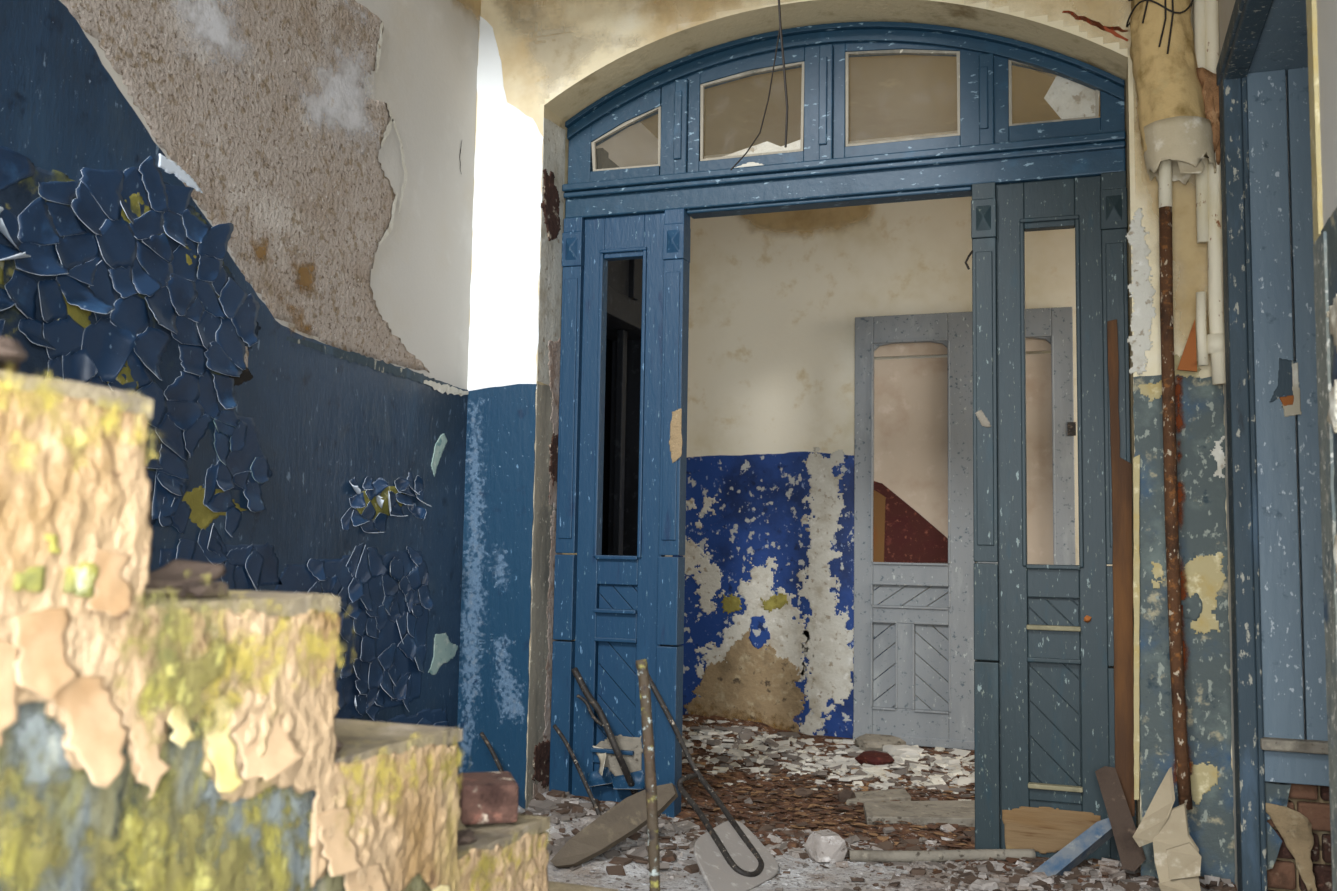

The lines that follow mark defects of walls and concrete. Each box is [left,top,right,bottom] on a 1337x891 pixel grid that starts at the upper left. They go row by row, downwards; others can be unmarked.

flaking render [541,169,561,241]
peeling [1126,208,1201,402]
peeling [0,0,549,891]
rust [1175,376,1184,460]
rust [1177,482,1185,524]
flaking render [532,338,563,789]
peeling [680,447,975,801]
peeling [1181,552,1226,634]
peeling [587,734,645,789]